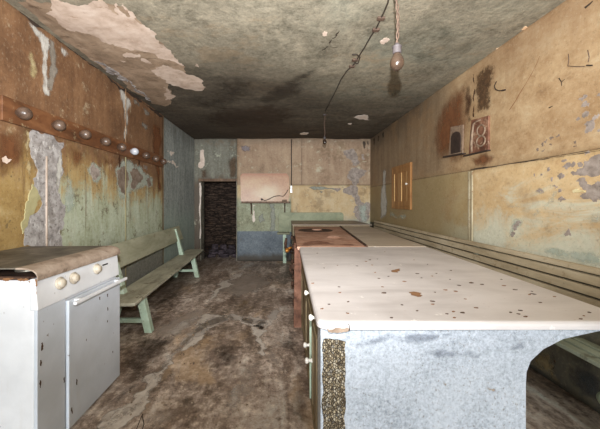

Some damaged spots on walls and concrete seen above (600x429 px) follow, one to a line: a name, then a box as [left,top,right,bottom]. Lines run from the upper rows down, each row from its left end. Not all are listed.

leakage [30,25,66,95]
peeling [18,0,205,106]
leakage [120,90,149,138]
mould [473,66,493,117]
spalling [21,130,73,246]
peeling [116,161,152,198]
peeling [310,149,370,222]
peeling [534,151,600,202]